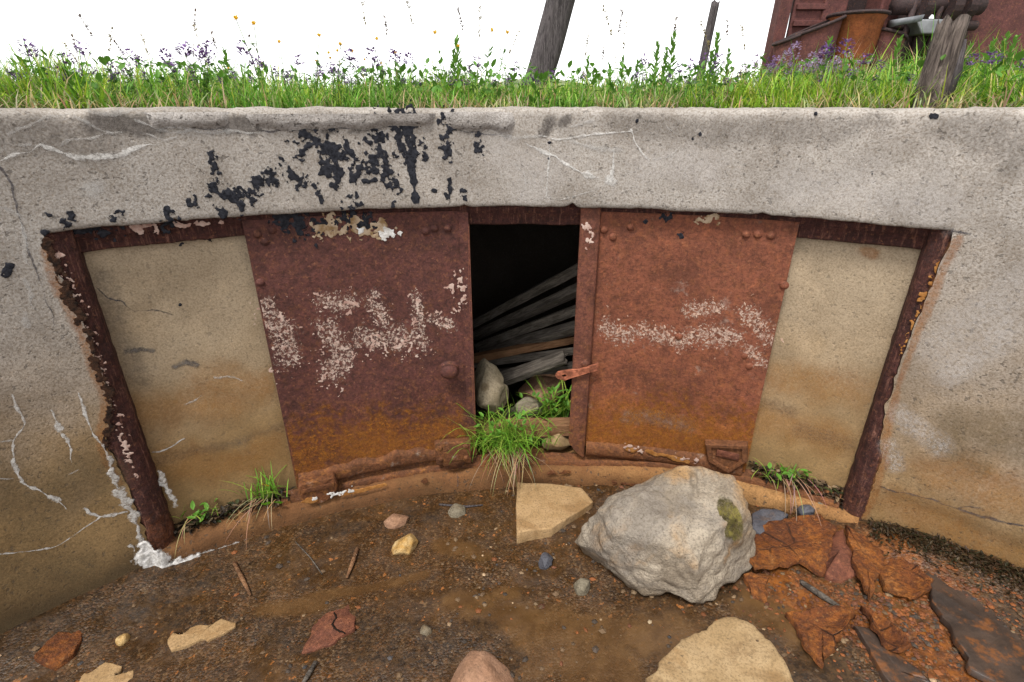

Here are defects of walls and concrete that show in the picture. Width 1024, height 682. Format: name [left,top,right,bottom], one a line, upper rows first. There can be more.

efflorescence [102,444,239,569]
peeling [40,99,468,542]